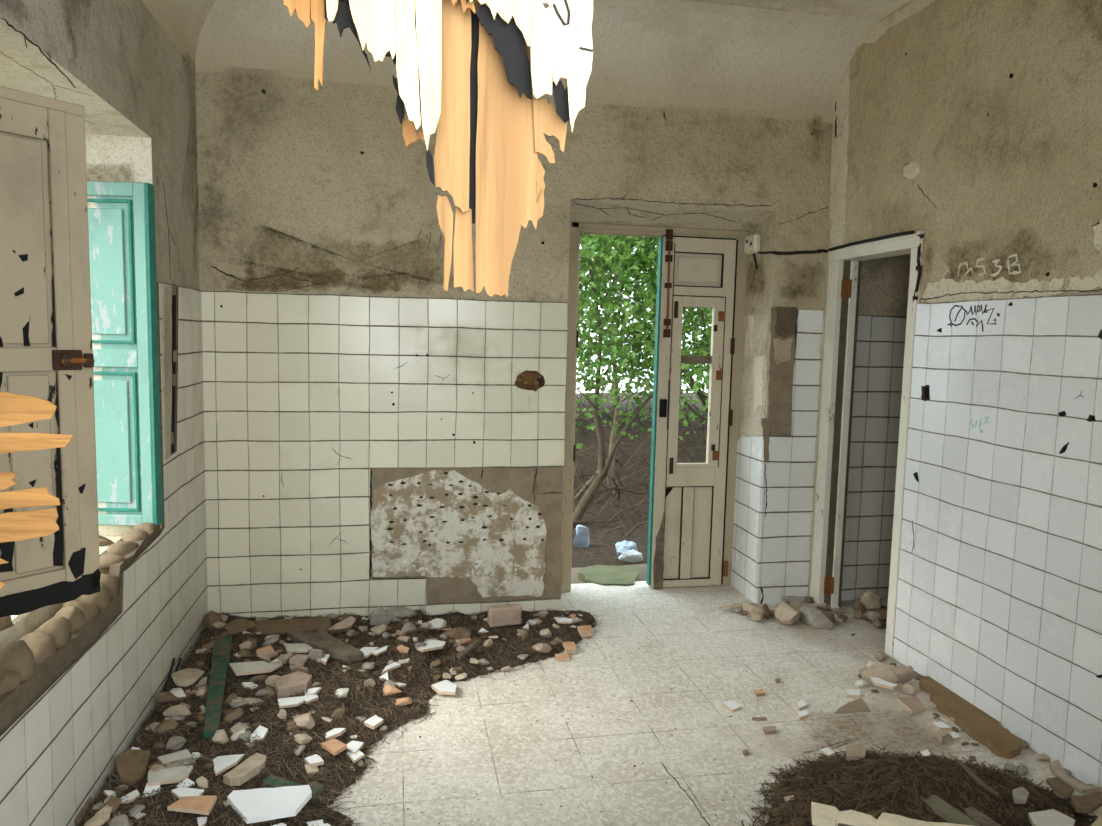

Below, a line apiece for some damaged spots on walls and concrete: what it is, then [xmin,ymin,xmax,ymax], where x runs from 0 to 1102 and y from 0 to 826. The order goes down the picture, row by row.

crack [0,18,91,124]
damp [243,228,440,289]
peeling [920,269,1102,306]
peeling [1092,219,1102,254]
spalling [517,372,543,388]
peeling [740,306,797,463]
spalling [369,467,564,604]